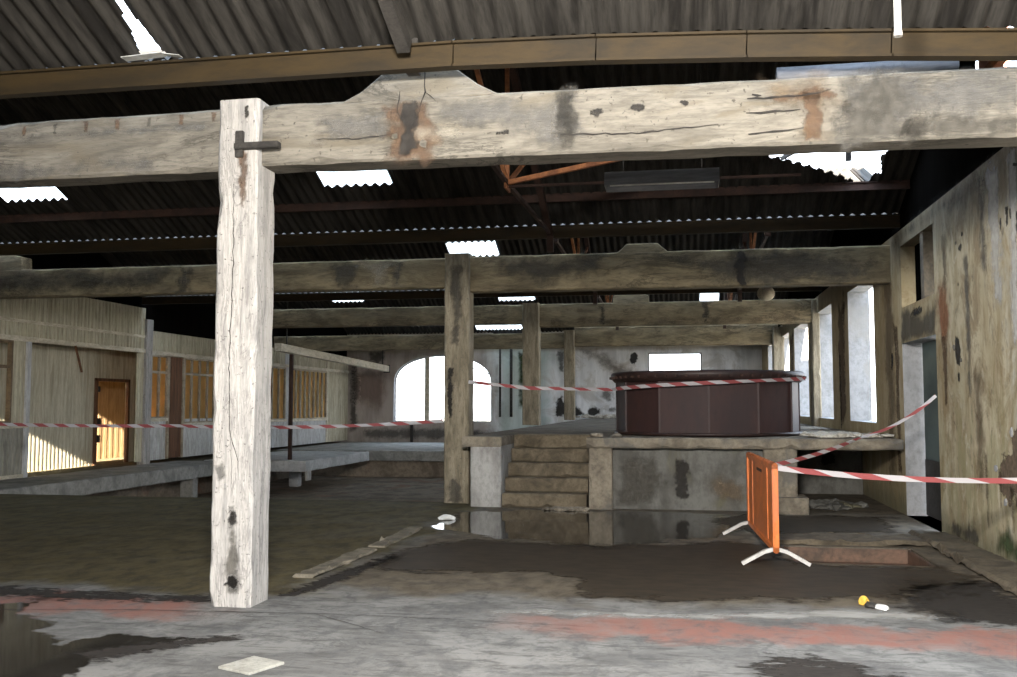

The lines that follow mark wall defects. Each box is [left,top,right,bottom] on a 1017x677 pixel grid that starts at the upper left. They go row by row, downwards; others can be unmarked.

corrosion [778,87,833,138]
damp [951,149,1017,339]
damp [968,372,987,478]
peeling [994,427,1017,519]
damp [998,530,1017,561]
damp [736,653,905,677]